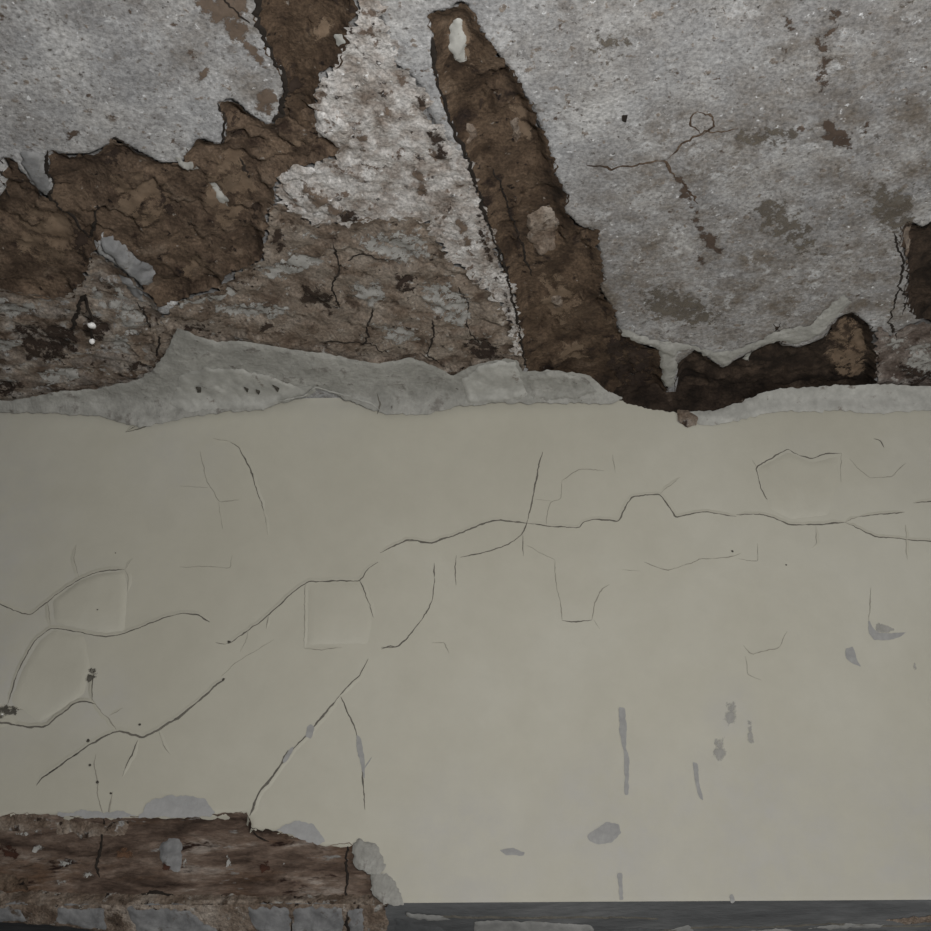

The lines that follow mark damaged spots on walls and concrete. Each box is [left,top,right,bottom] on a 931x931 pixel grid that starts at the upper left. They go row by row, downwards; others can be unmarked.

spalling [0,0,931,428]
crack [587,112,738,204]
crack [0,438,931,816]
spalling [0,795,450,931]
peeling [474,920,594,931]
peeling [808,915,931,930]